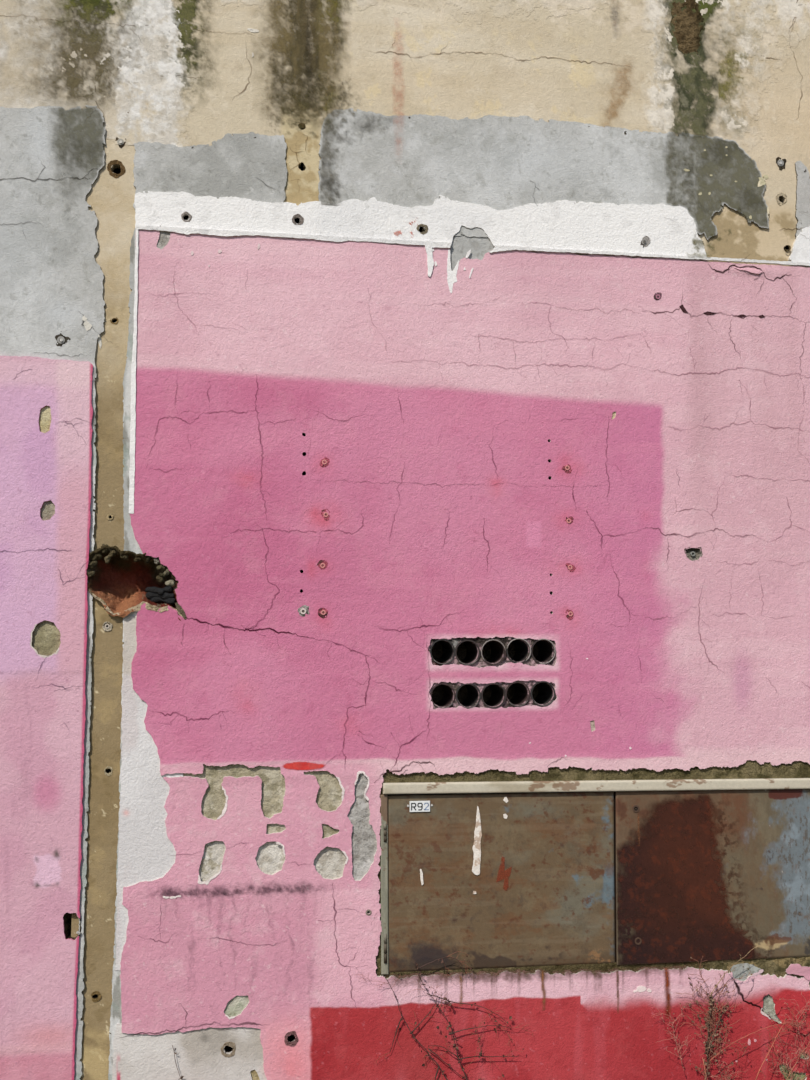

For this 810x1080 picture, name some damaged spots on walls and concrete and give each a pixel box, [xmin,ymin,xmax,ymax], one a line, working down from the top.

flaking render [86,116,136,252]
spalling [157,231,171,249]
damp [0,0,621,206]
peeling [432,234,494,293]
flaking render [174,0,810,268]
damp [639,0,810,256]
peeling [86,544,286,971]
corrosion [617,795,760,1013]
crack [731,977,810,1037]
spalling [779,1064,806,1080]